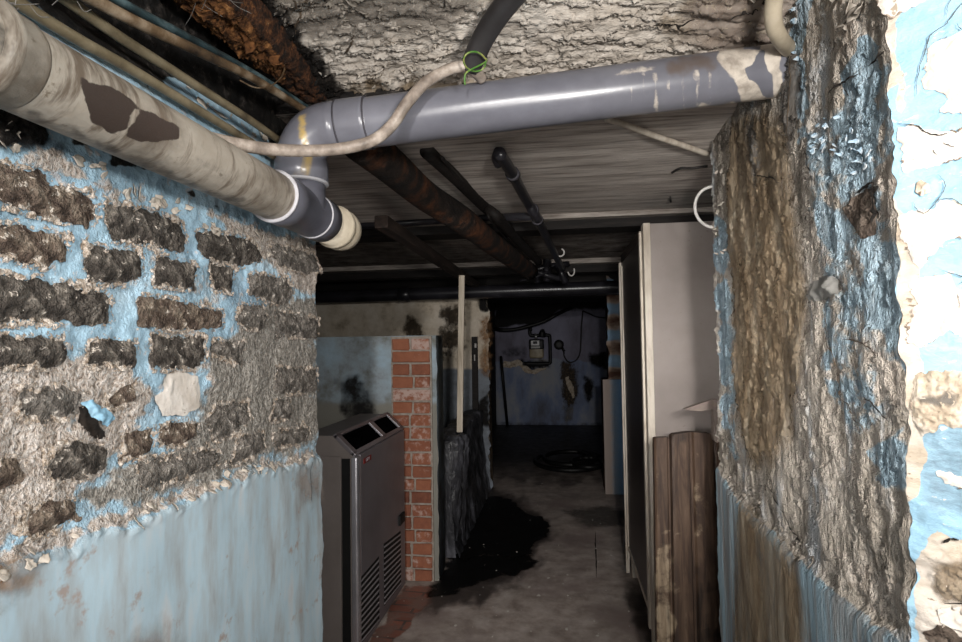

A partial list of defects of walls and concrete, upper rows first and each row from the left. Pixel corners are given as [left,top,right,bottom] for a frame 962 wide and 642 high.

rust [174,0,286,83]
peeling [835,0,864,31]
peeling [921,31,962,114]
peeling [808,115,872,175]
peeling [897,123,962,196]
spalling [842,181,879,239]
peeling [897,200,962,347]
spalling [0,121,323,571]
mould [439,305,466,356]
water stain [561,361,593,421]
flaking render [0,569,12,582]
spalling [923,563,962,642]